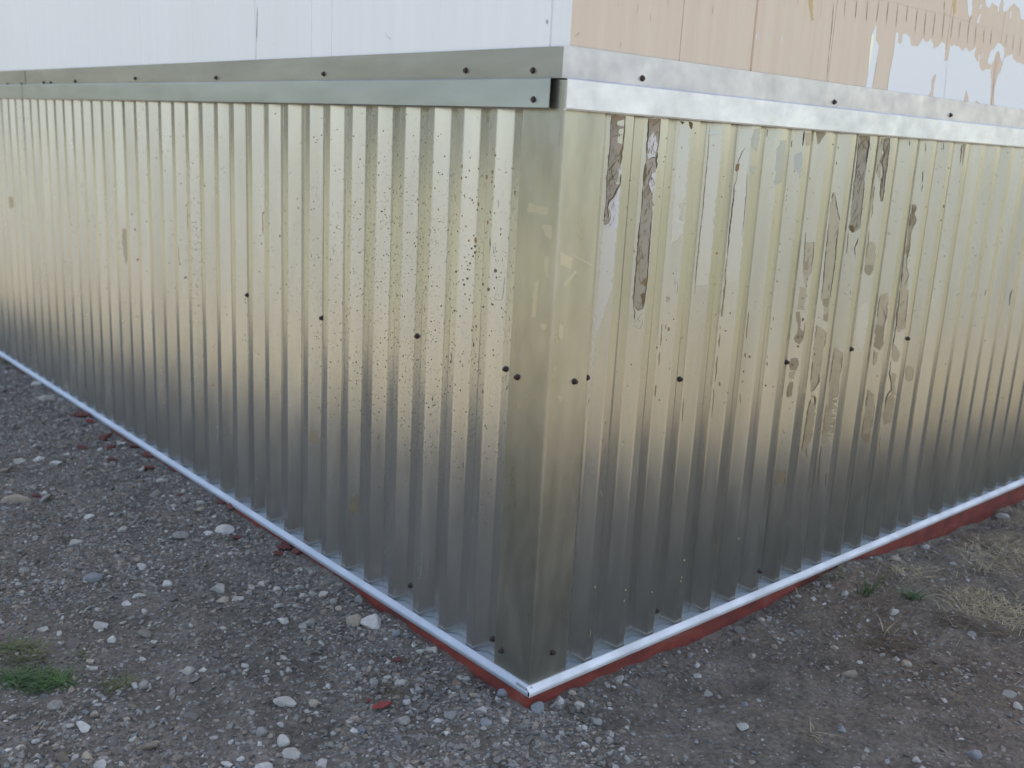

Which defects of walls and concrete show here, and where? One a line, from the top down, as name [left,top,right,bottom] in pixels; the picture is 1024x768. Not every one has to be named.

peeling [967,0,1024,23]
peeling [866,26,879,88]
peeling [888,32,1024,110]
peeling [604,115,625,228]
peeling [632,118,660,311]
peeling [848,141,868,231]
peeling [879,138,889,201]
peeling [905,204,917,259]